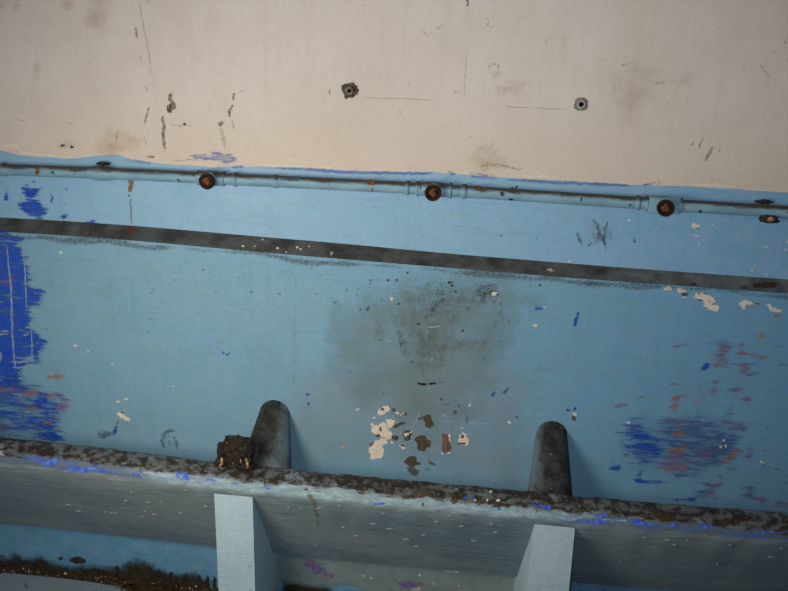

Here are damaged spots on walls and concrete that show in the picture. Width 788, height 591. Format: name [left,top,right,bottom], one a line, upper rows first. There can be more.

spalling [341,82,359,99]
peeling [18,181,53,219]
peeling [664,286,719,312]
peeling [739,300,782,318]
peeling [0,232,68,441]
peeling [175,406,681,533]
peeling [615,419,749,484]